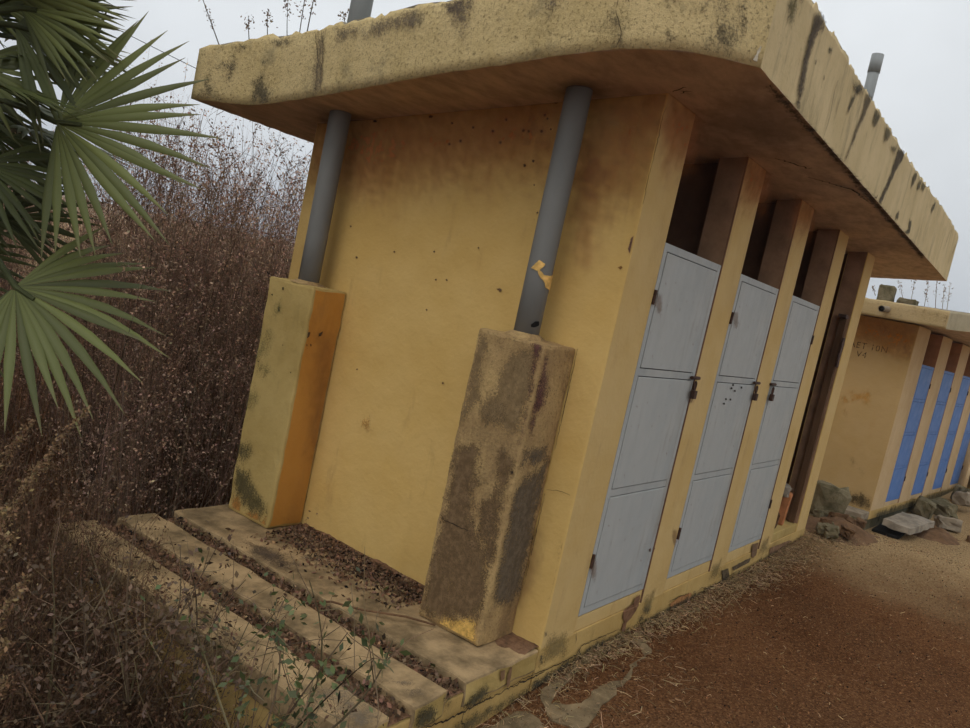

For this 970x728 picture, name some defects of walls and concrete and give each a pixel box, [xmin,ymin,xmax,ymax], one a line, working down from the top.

water stain [336,10,423,42]
water stain [442,0,474,33]
water stain [709,5,746,51]
water stain [769,11,924,259]
water stain [234,443,265,517]
water stain [492,446,550,606]